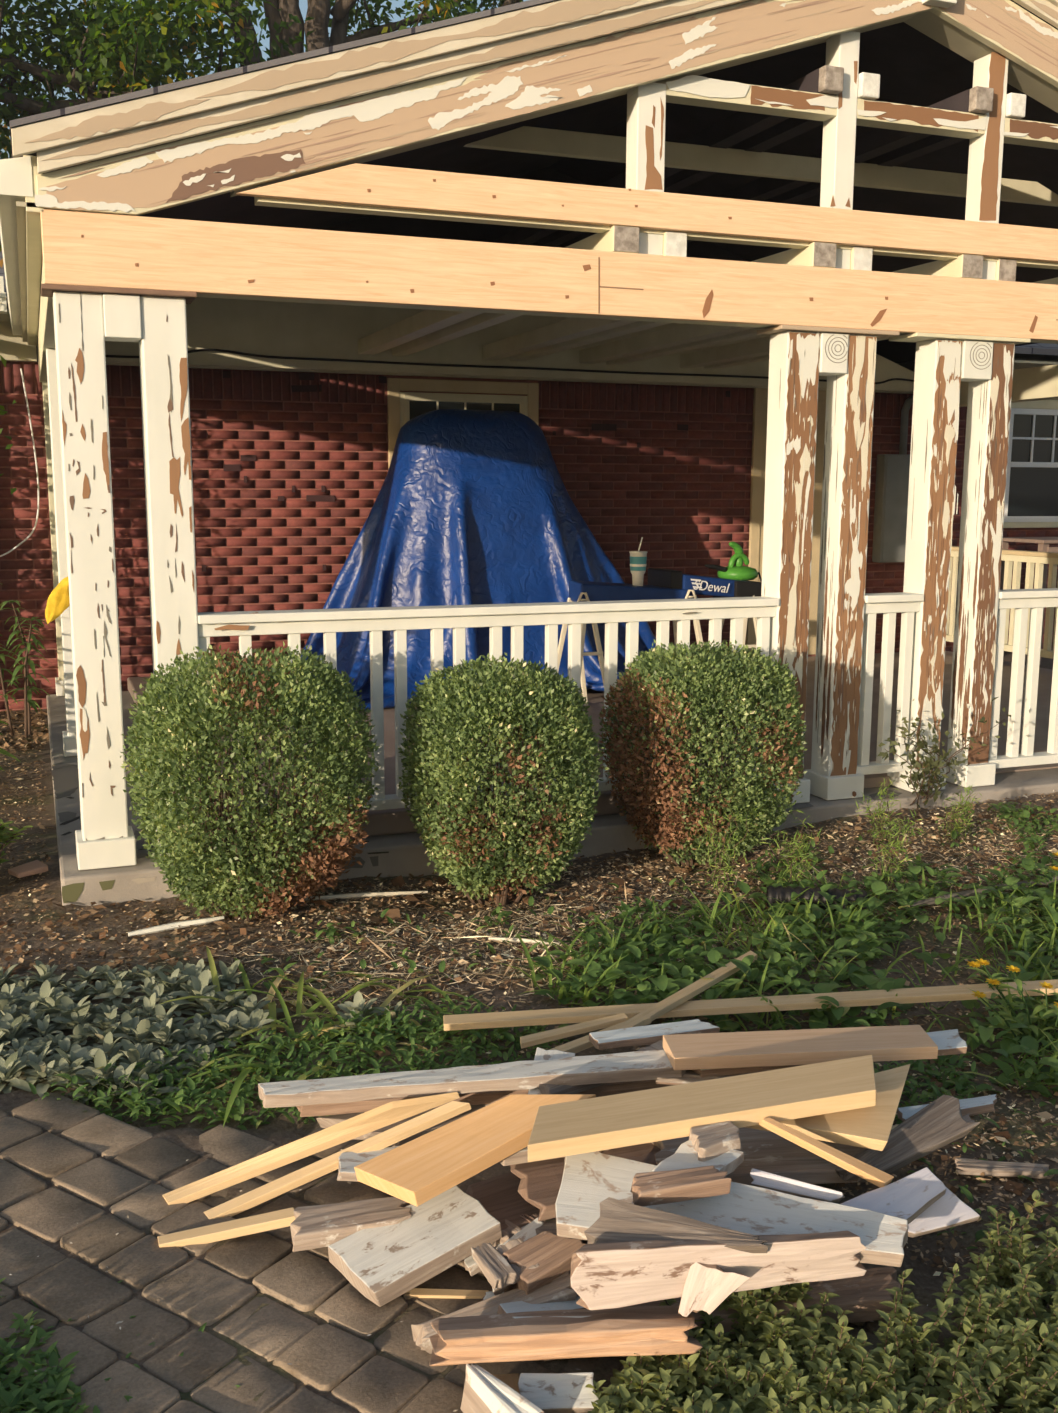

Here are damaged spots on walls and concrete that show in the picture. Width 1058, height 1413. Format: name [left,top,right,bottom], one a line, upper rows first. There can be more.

peeling [25,0,1058,221]
peeling [75,348,84,384]
peeling [62,411,110,489]
peeling [82,474,90,499]
peeling [169,358,192,532]
peeling [778,332,877,779]
peeling [914,339,1014,769]
peeling [76,665,90,759]